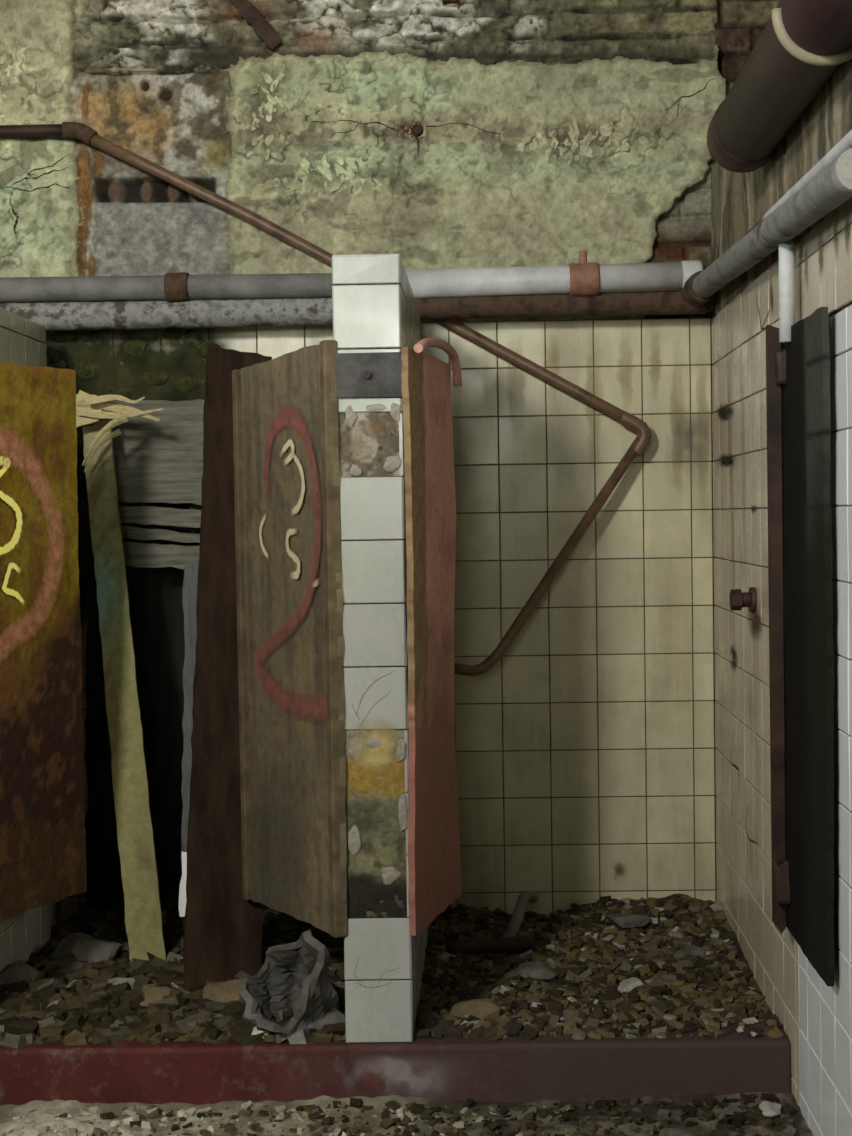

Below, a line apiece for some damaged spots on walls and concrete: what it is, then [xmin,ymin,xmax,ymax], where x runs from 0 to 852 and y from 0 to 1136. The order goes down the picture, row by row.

flaking render [71,0,780,276]
corrosion [76,145,104,276]
flaking render [645,311,712,319]